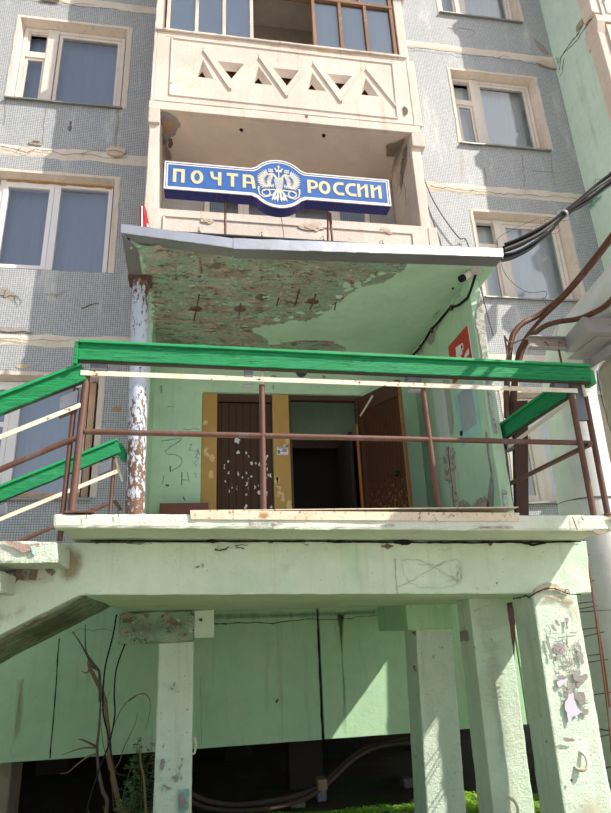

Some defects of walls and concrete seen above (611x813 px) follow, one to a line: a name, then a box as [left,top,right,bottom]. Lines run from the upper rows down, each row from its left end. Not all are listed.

spalling [160,111,180,149]
peeling [138,245,407,351]
peeling [476,289,488,359]
peeling [443,380,477,435]
peeling [443,445,458,507]
peeling [485,381,497,507]
peeling [545,529,611,753]